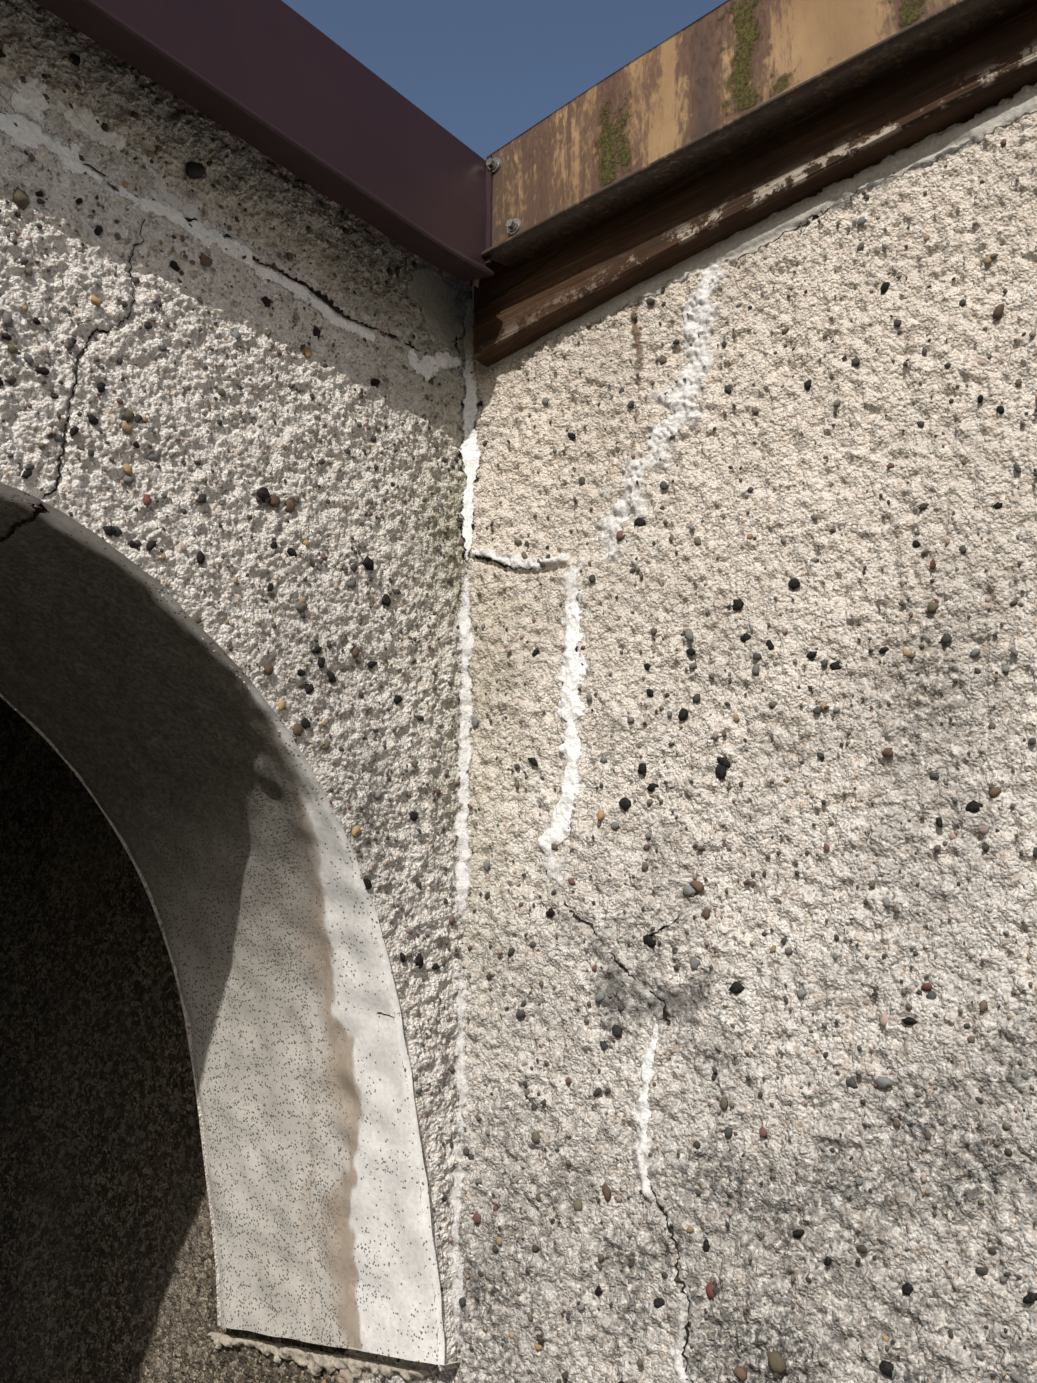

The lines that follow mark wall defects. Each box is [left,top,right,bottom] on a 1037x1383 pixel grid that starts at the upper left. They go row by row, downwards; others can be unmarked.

crack [0,111,462,542]
crack [632,1023,697,1383]